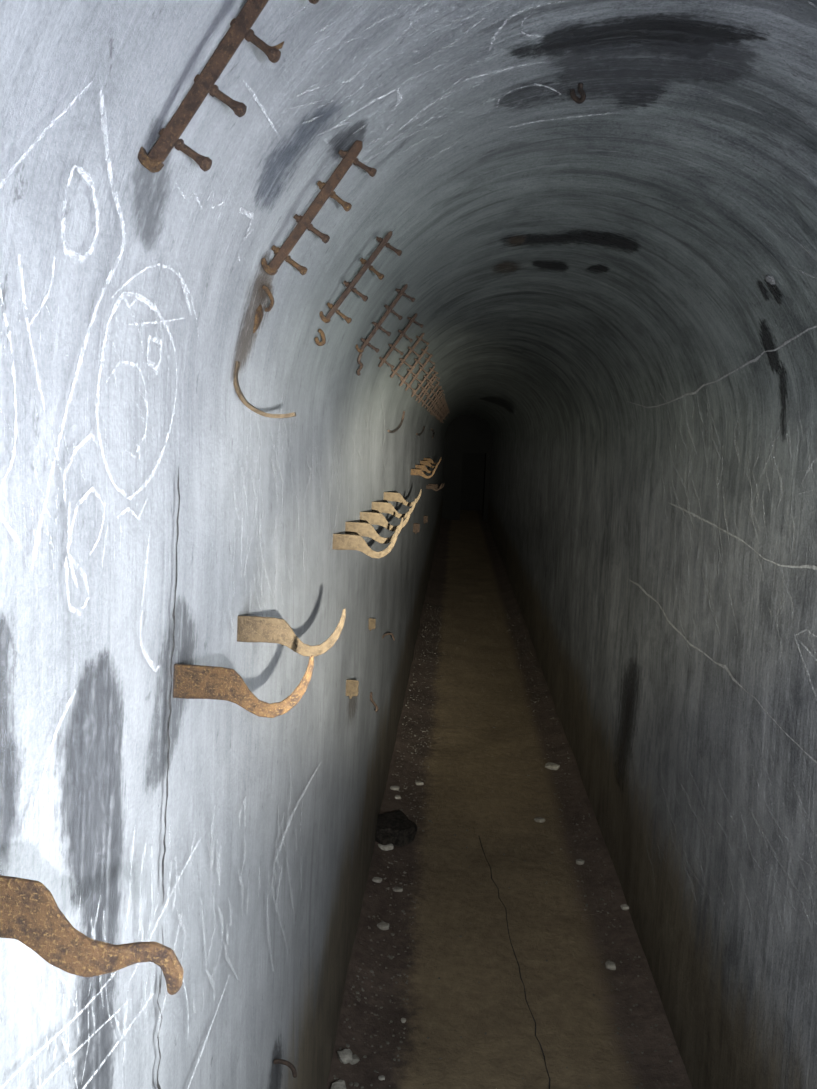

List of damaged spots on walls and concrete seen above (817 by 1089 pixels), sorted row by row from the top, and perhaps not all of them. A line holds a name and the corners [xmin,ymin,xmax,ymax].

leakage [496,13,769,108]
leakage [533,260,570,272]
leakage [503,230,640,253]
crack [627,325,817,408]
crack [668,502,817,570]
crack [162,467,180,901]
leakage [0,617,22,875]
leakage [60,653,124,944]
leakage [75,971,117,1089]
crack [156,928,164,1089]
crack [479,837,551,1089]